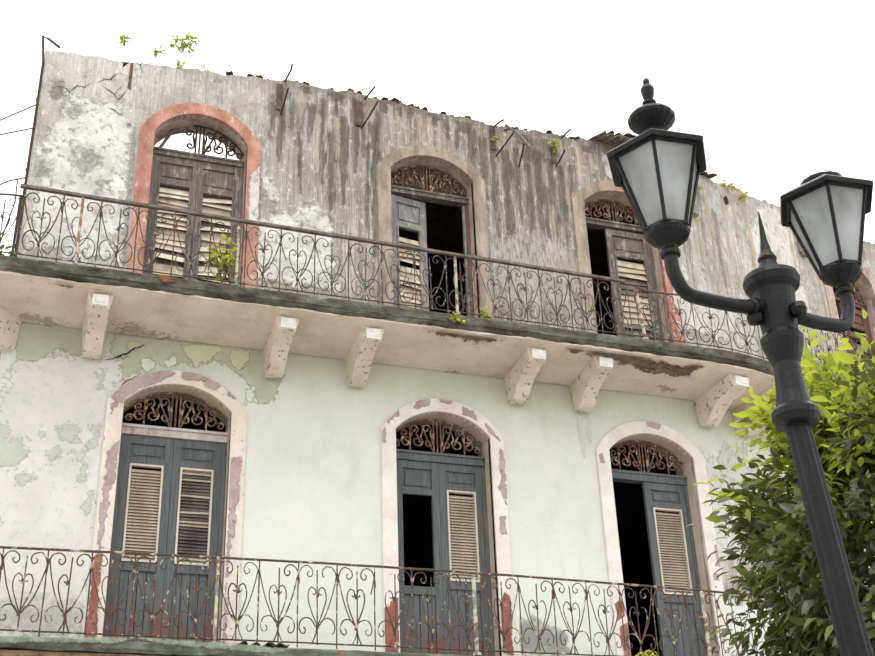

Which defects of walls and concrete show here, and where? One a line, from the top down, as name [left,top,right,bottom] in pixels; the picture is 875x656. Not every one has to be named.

crack [55,69,126,115]
leakage [37,148,54,176]
leakage [68,140,101,175]
leakage [270,86,412,257]
peeling [600,152,613,180]
leakage [426,113,580,317]
peeling [672,287,744,343]
crack [105,345,144,387]
spalling [569,349,704,377]
peeling [0,325,285,643]